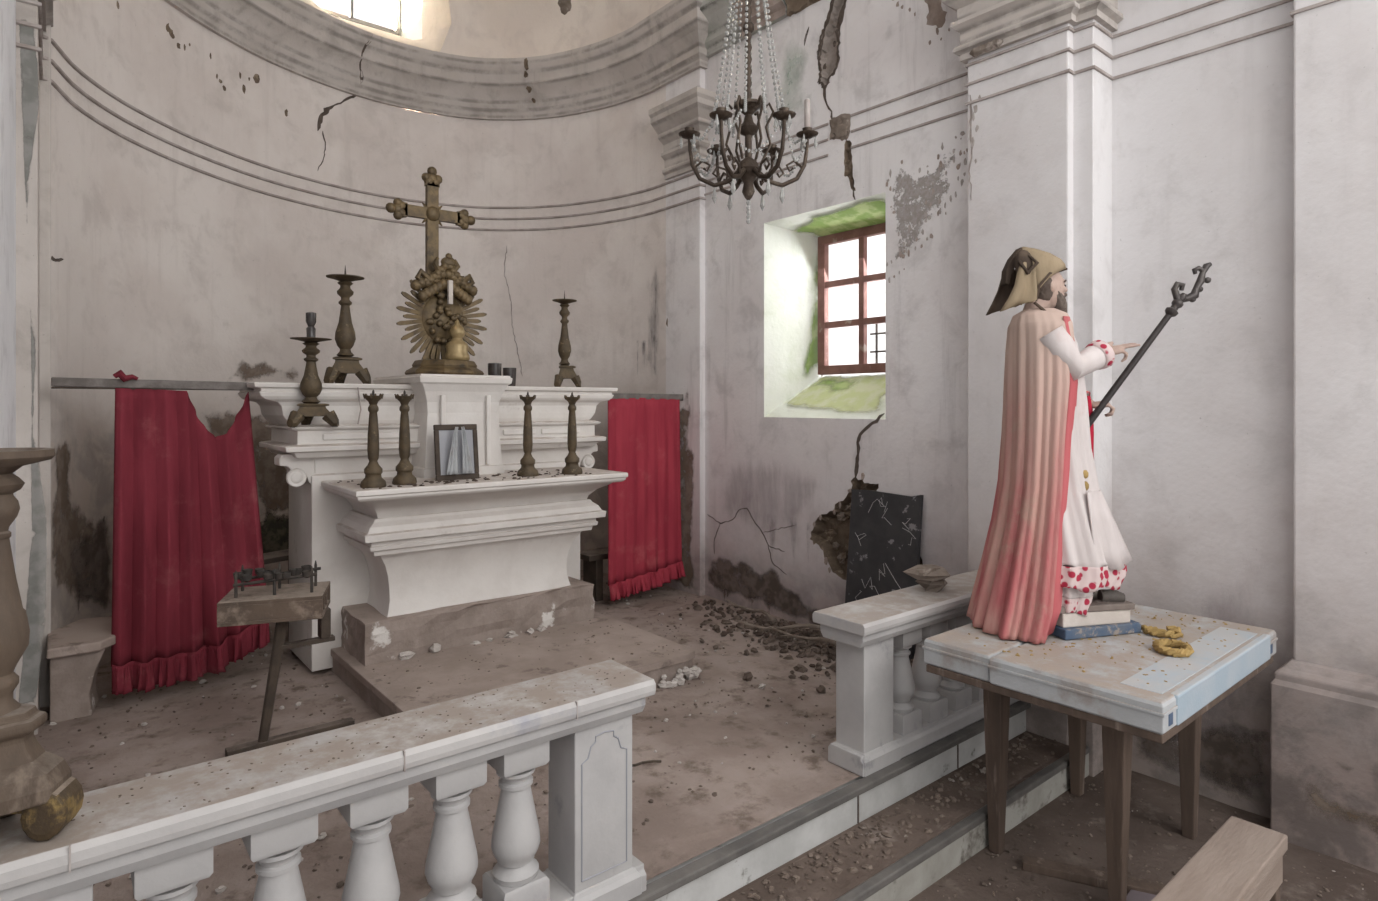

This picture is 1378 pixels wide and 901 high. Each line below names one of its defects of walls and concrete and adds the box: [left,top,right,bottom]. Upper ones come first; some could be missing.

spalling [558,0,572,15]
spalling [896,0,950,45]
crack [317,34,373,169]
peeling [886,95,981,283]
crack [854,413,885,478]
damp [71,520,110,606]
damp [676,409,820,625]
crack [708,508,795,575]
spalling [810,473,879,580]